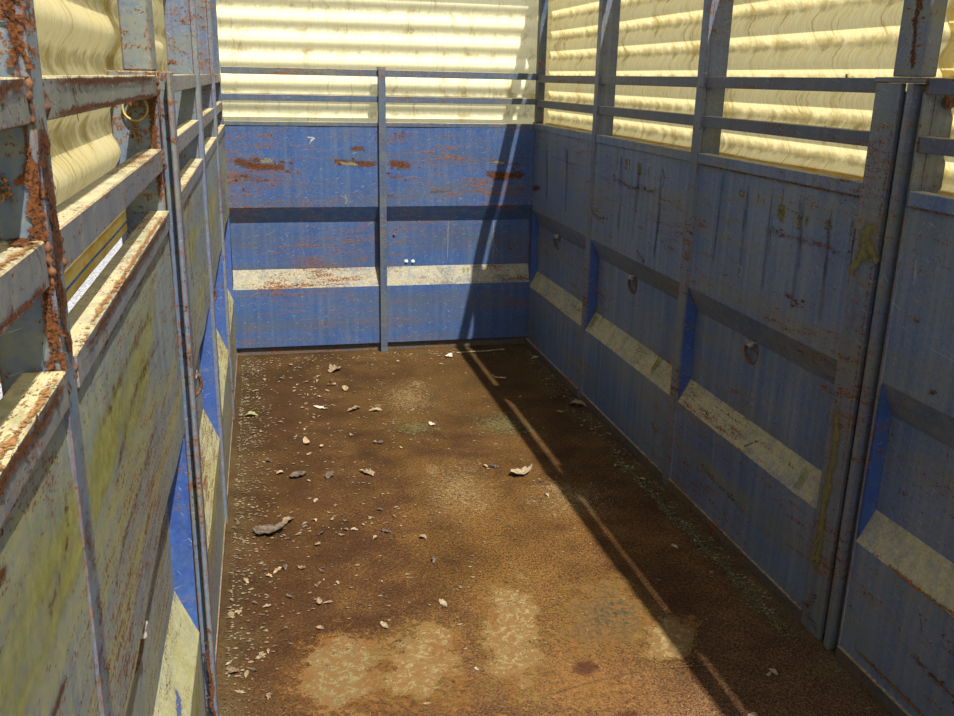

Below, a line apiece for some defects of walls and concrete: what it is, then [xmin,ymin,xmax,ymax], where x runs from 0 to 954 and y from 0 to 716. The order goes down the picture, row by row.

rust [0,77,25,102]
rust [332,146,410,181]
rust [487,159,541,191]
rust [0,238,41,269]
rust [0,275,51,335]
rust [0,375,79,495]